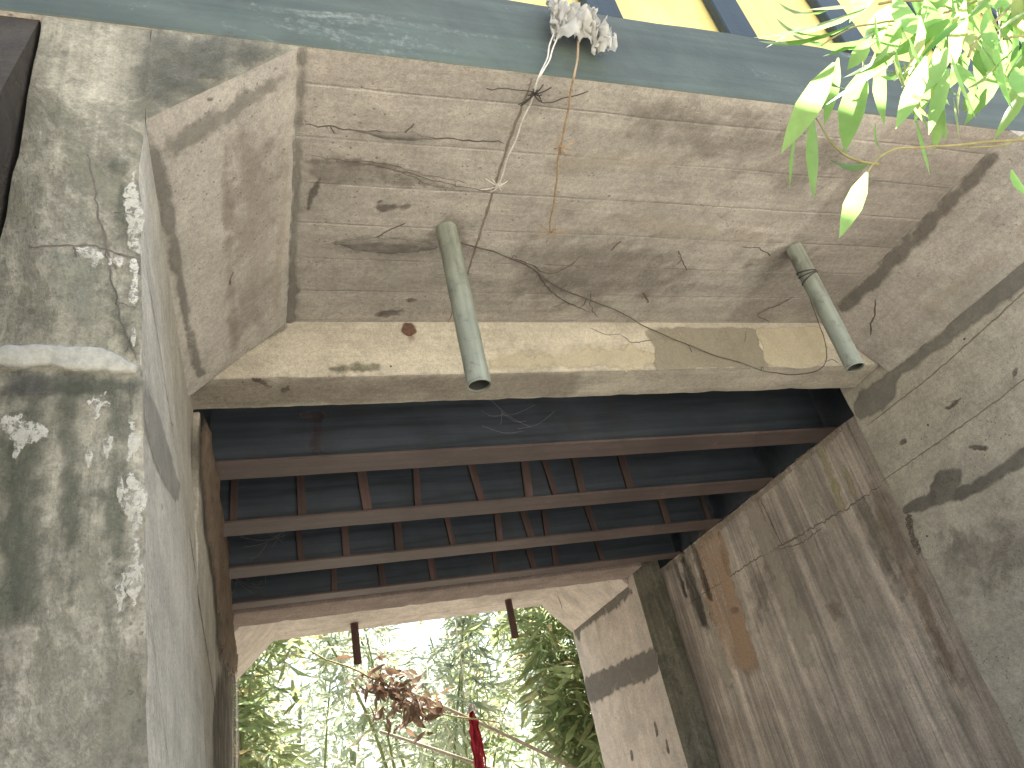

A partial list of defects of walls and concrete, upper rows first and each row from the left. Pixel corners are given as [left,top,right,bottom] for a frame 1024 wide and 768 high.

crack [27,153,139,361]
water stain [118,188,130,222]
rust [401,323,416,336]
crack [305,78,532,275]
crack [515,257,651,343]
water stain [0,414,43,625]
water stain [5,375,129,544]
water stain [102,456,130,557]
rust [697,533,758,674]